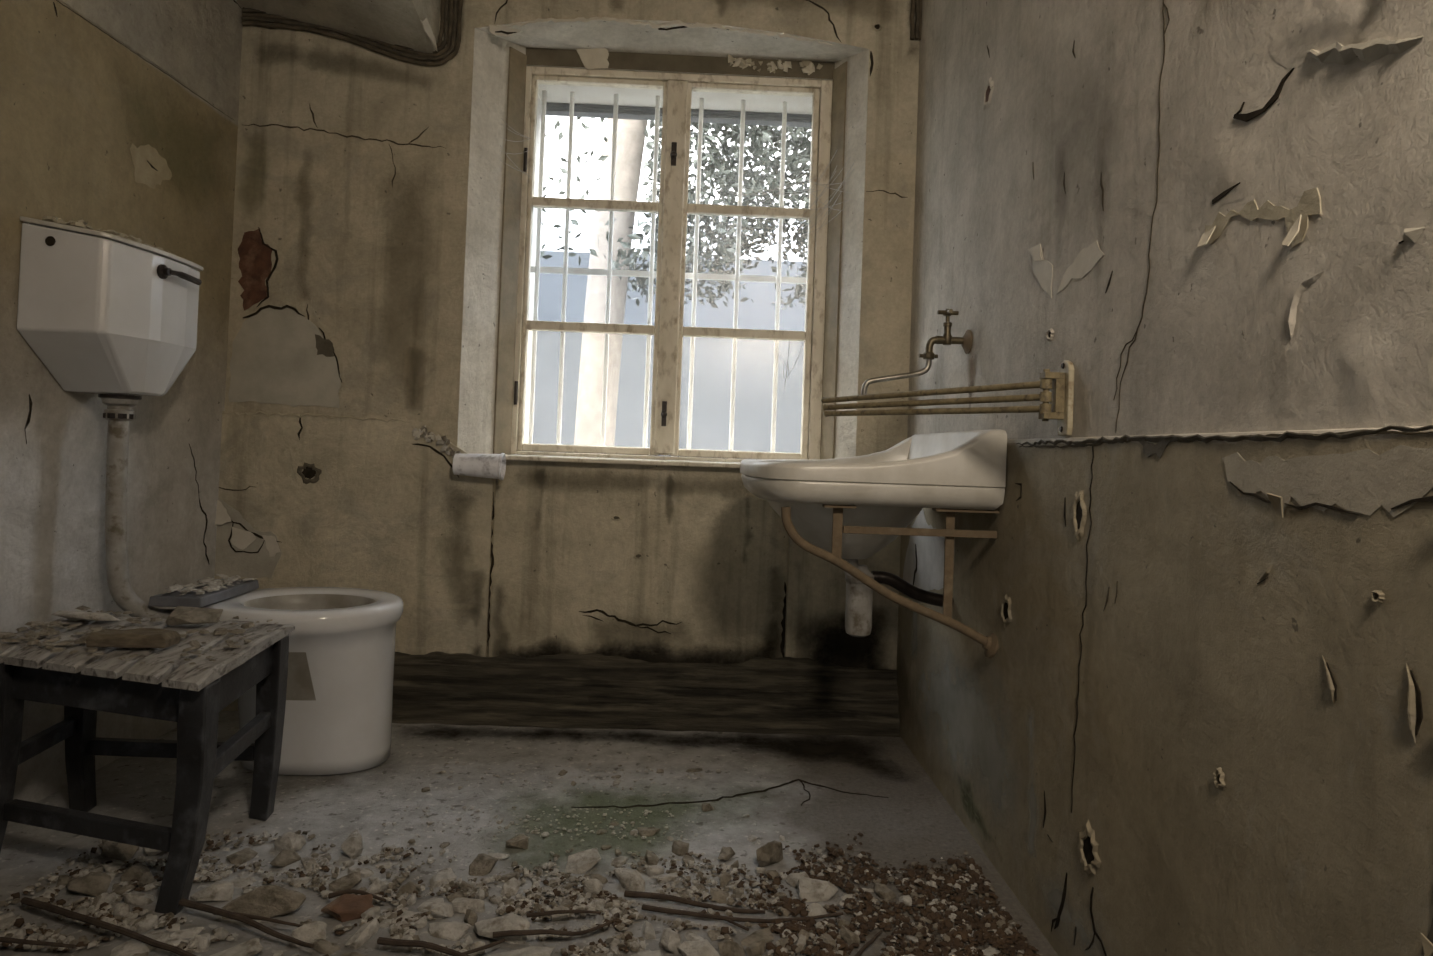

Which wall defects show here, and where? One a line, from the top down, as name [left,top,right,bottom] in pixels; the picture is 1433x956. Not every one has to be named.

crack [1233,68,1294,122]
crack [245,103,444,188]
peeling [1197,187,1322,248]
peeling [1028,240,1104,298]
crack [1043,0,1170,841]
peeling [1016,425,1433,518]
flaking render [1072,489,1087,542]
crack [579,609,681,634]
damp [513,641,776,664]
damp [806,612,885,669]
crack [571,779,889,808]
flaking render [1078,820,1101,875]